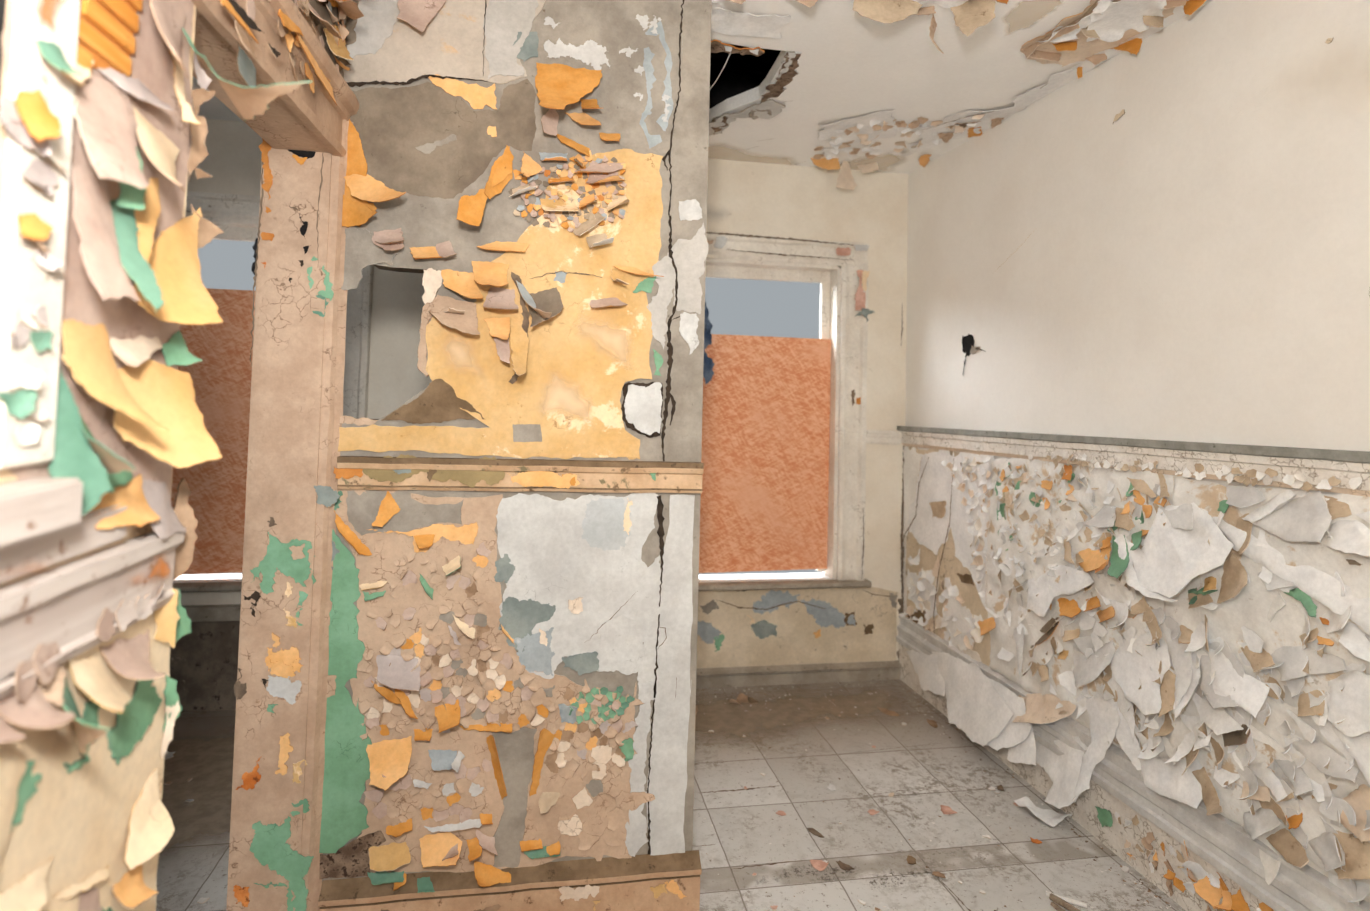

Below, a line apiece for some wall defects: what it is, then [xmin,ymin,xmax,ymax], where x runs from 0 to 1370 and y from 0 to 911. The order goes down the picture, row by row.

peeling [811,0,1206,190]
crack [661,0,685,461]
peeling [854,270,875,321]
spalling [962,334,986,375]
peeling [0,0,869,911]
crack [647,495,677,855]
peeling [233,446,1370,911]
crack [696,759,783,793]
crack [693,844,803,870]